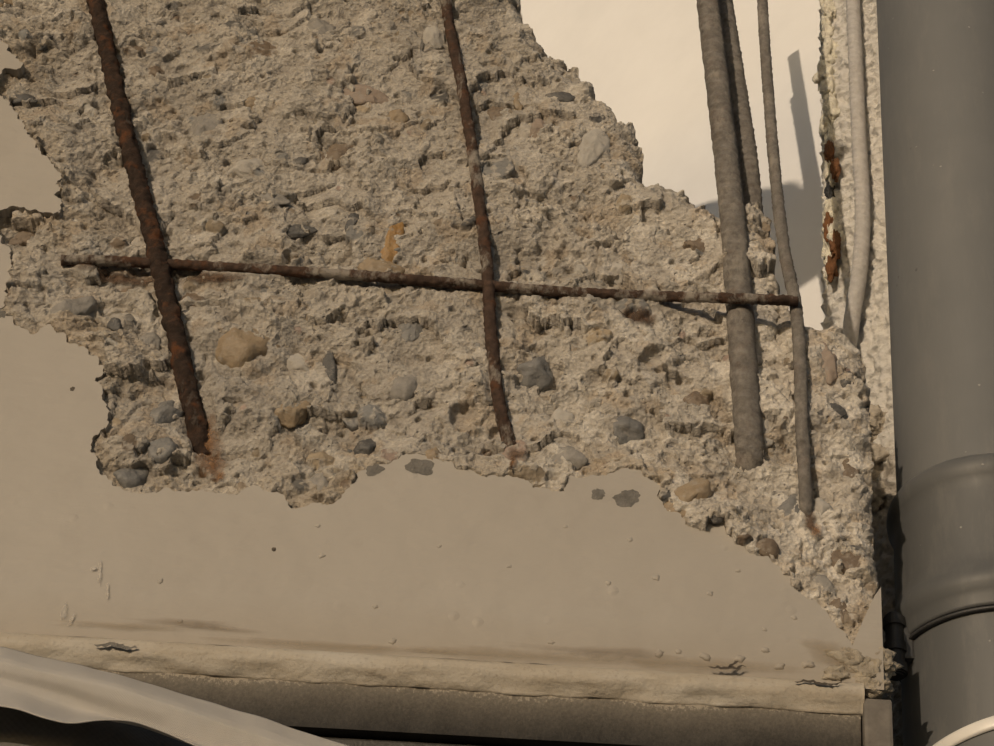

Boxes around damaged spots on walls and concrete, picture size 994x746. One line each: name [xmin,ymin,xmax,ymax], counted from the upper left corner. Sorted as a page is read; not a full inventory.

corrosion [823,140,841,183]
corrosion [822,211,841,283]
spalling [0,0,879,645]
spalling [821,647,904,699]